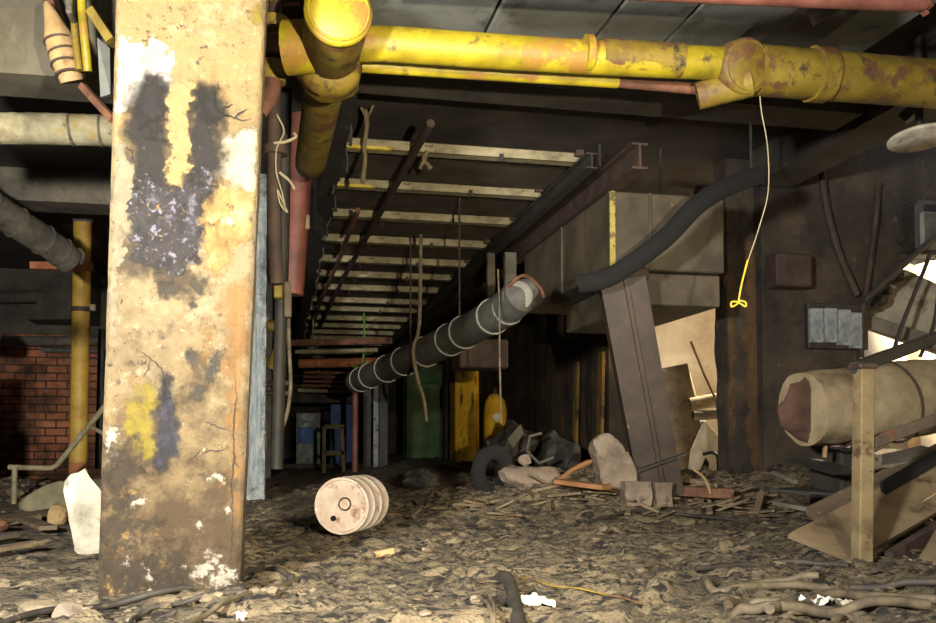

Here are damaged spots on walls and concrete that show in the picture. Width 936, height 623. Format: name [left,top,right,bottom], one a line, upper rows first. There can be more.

water stain [138,74,170,136]
water stain [200,85,227,125]
peeling [114,29,263,295]
water stain [117,241,206,309]
water stain [184,348,224,400]
peeling [247,312,267,490]